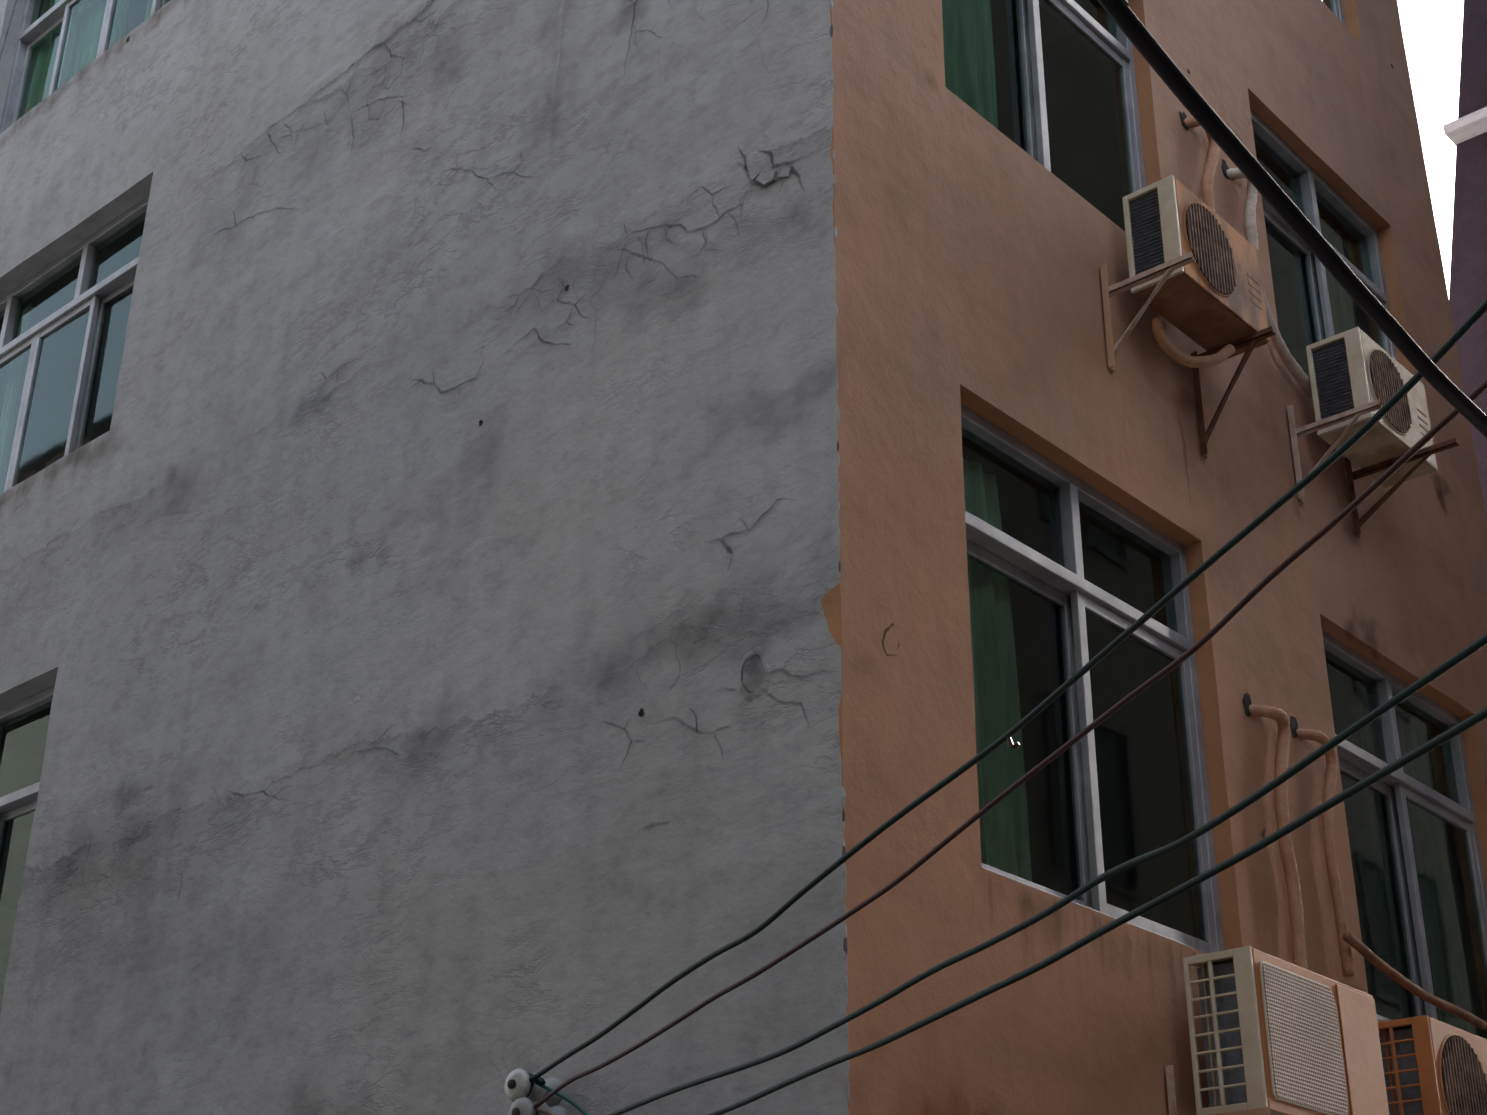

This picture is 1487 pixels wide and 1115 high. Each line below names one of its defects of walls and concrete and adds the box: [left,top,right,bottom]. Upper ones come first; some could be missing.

crack [744,151,799,182]
crack [634,189,731,260]
crack [524,277,584,345]
crack [718,498,782,553]